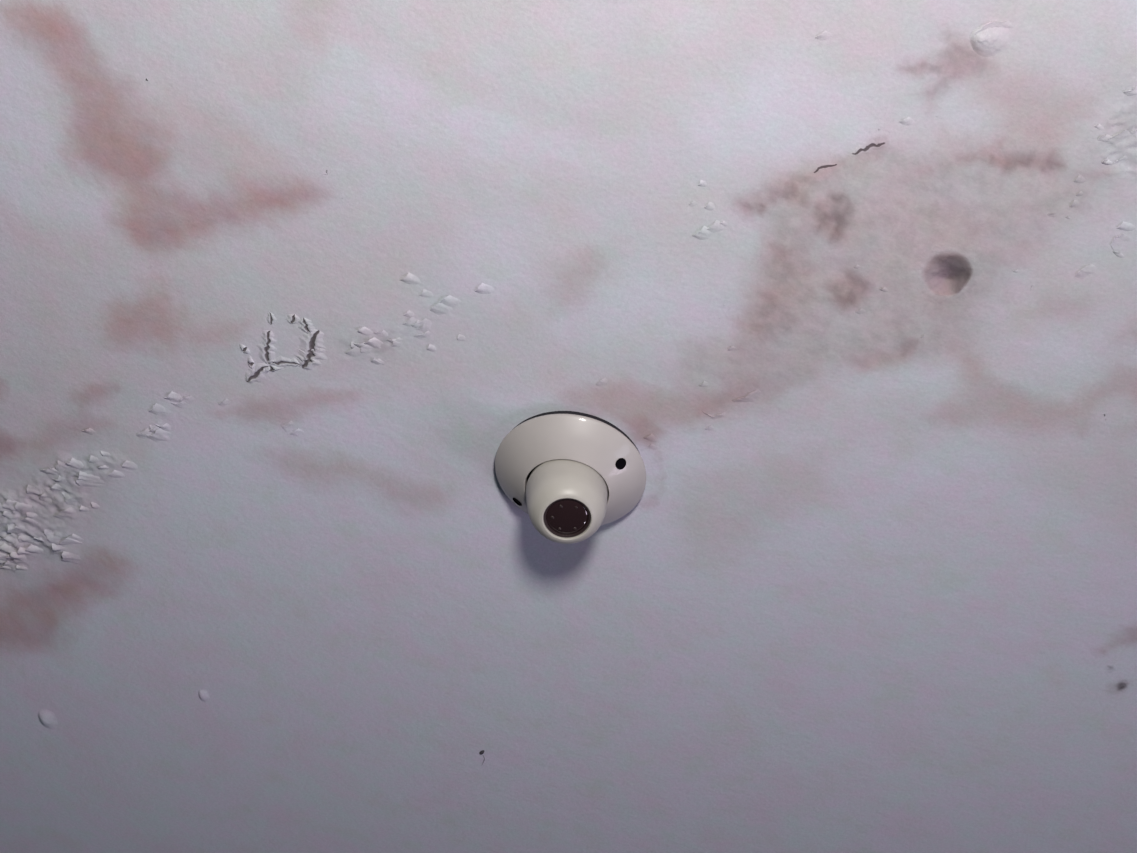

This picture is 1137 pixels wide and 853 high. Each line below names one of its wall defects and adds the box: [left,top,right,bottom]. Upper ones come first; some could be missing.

damp [648,15,1137,397]
hole [912,243,983,305]
peeling [1090,59,1137,206]
peeling [0,441,138,573]